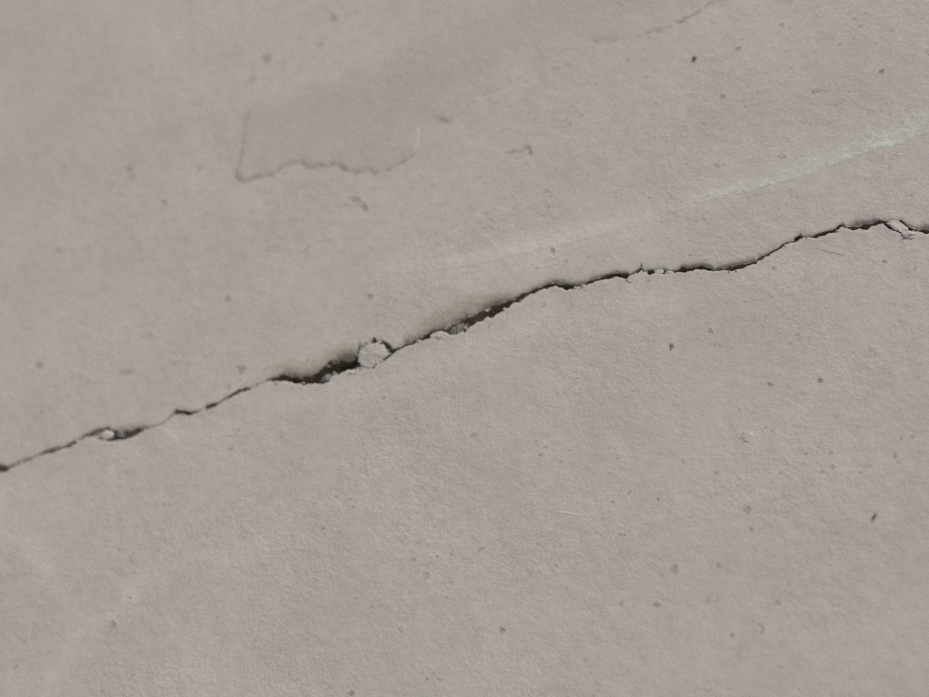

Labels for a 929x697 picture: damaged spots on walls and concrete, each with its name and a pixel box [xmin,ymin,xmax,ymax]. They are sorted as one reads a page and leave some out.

crack [0,220,929,473]